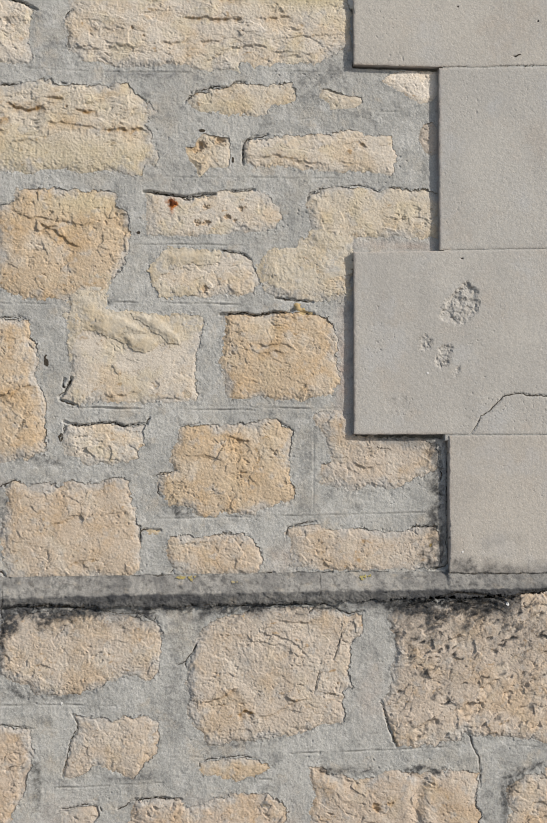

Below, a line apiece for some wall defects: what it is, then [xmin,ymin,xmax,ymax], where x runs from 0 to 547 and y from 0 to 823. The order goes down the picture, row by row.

spalling [438,280,481,326]
spalling [417,333,461,380]
crack [473,393,547,430]